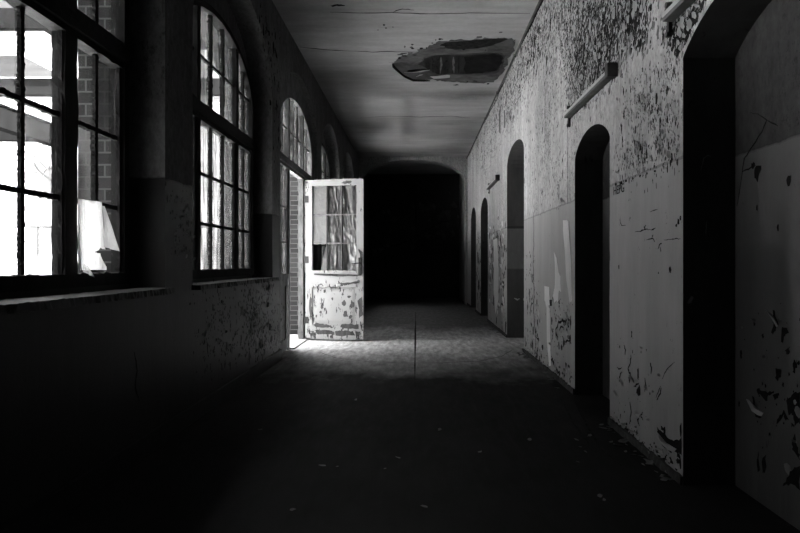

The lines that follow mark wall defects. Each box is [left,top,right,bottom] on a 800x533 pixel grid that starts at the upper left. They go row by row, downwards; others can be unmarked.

peeling [392,0,707,215]
peeling [523,252,573,385]
peeling [610,345,682,471]
peeling [738,303,800,490]